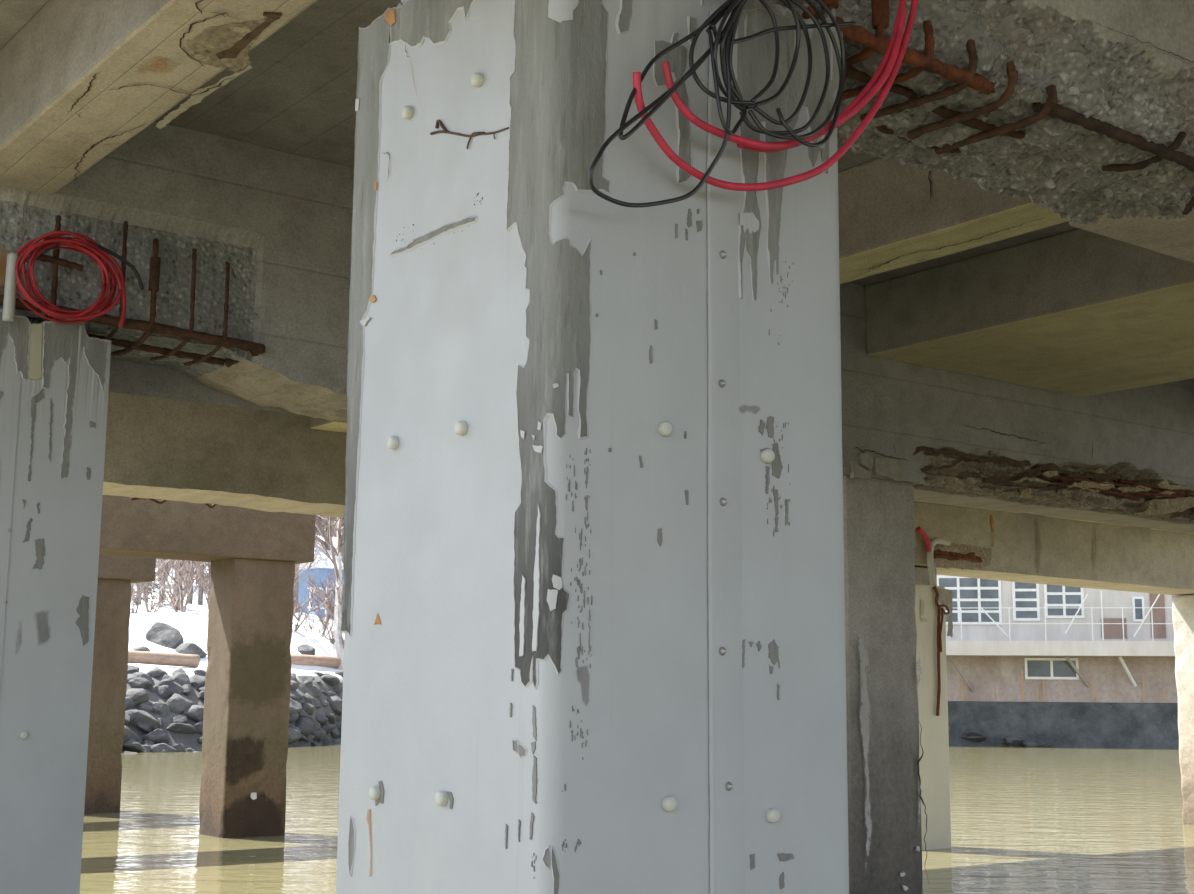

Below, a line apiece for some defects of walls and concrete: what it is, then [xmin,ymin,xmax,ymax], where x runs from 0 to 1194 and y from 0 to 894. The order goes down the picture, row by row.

crack [68,0,239,118]
spalling [156,12,282,129]
crack [63,125,143,185]
spalling [737,0,1194,312]
spalling [0,200,266,482]
peeling [340,0,483,637]
peeling [507,0,633,759]
spalling [913,446,1194,524]
spalling [933,543,992,571]
leakage [226,738,264,784]
leakage [222,794,282,838]
peeling [504,705,581,894]